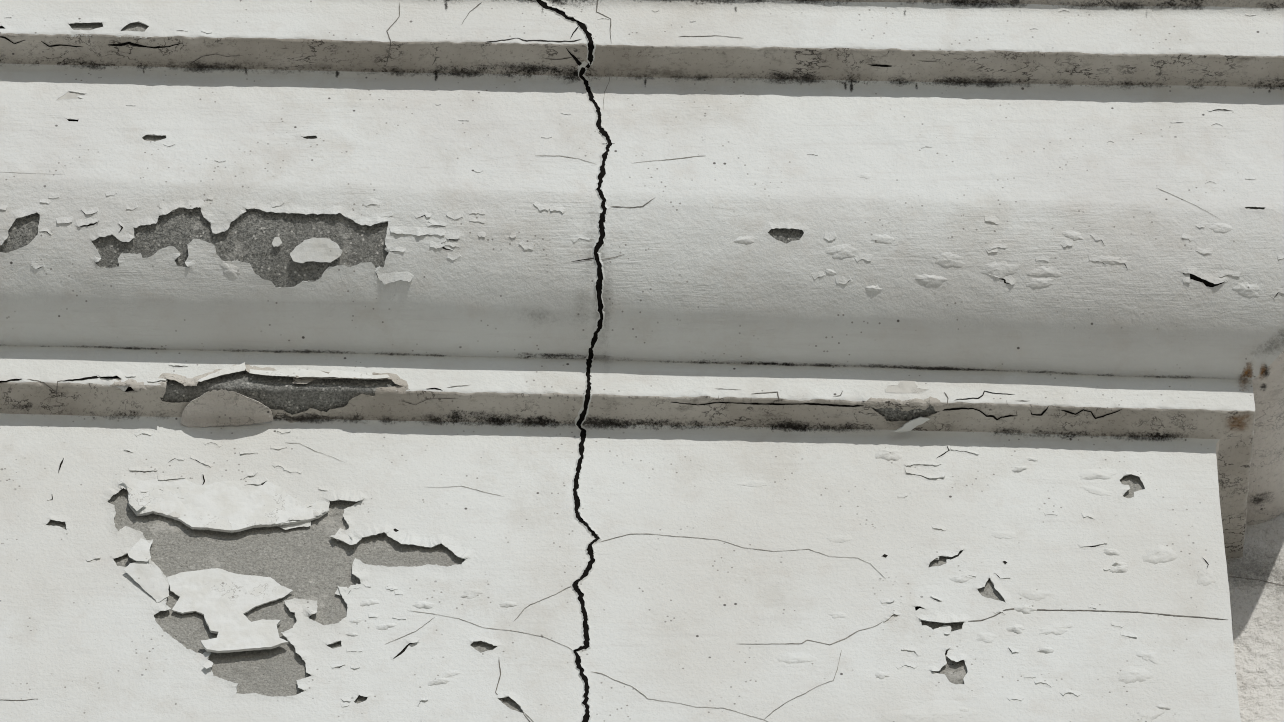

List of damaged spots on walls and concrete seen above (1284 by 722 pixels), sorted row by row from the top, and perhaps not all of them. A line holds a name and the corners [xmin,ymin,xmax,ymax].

water stain [483,63,579,80]
peeling [0,189,486,296]
peeling [759,220,838,252]
crack [386,0,883,722]
water stain [448,412,553,425]
water stain [771,421,806,431]
peeling [1111,469,1153,505]
peeling [85,362,476,704]
peeling [920,544,1014,616]
crack [972,608,1228,621]
peeling [879,594,976,691]
peeling [339,688,376,710]